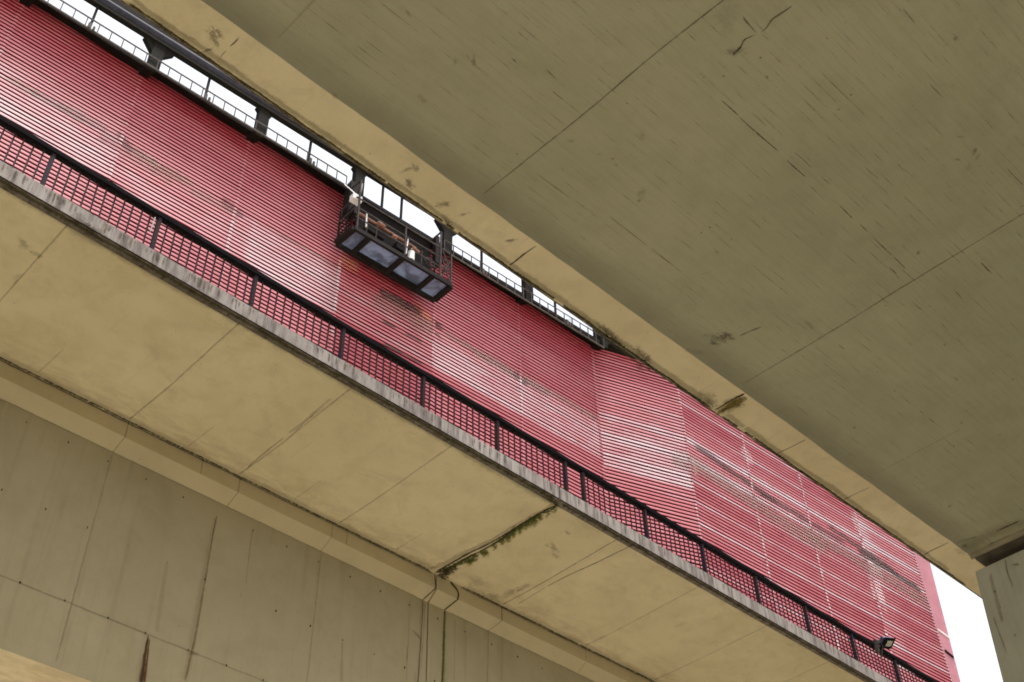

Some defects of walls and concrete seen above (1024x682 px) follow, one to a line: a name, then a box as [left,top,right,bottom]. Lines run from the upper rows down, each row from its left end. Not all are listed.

crack [734,7,790,54]
corrosion [140,636,150,682]